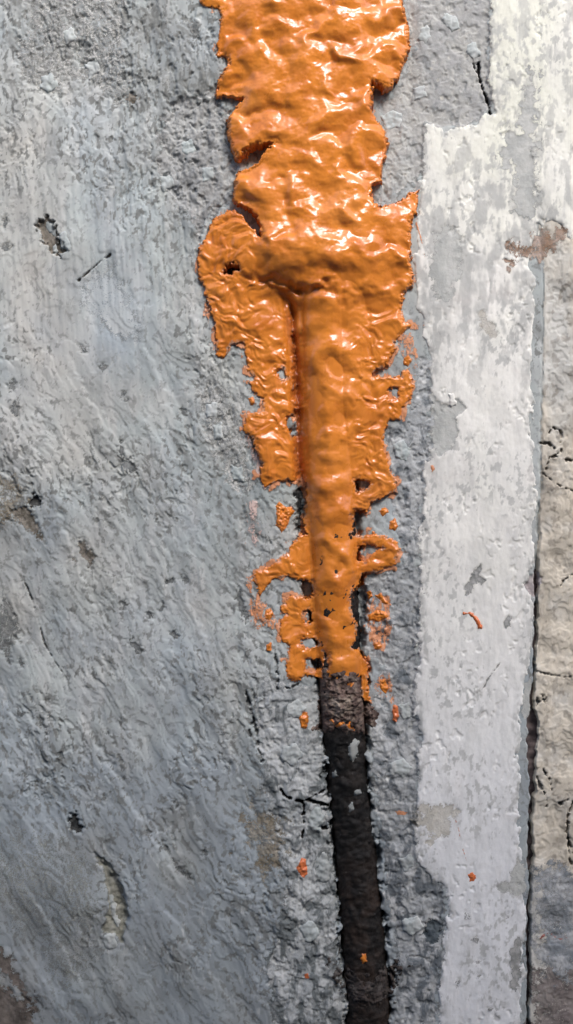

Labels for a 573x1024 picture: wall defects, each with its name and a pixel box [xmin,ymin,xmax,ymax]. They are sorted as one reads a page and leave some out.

crack [472,61,492,115]
peeling [495,65,544,221]
hole [34,214,72,259]
peeling [427,224,463,302]
crack [539,427,573,491]
spalling [465,565,486,596]
crack [245,691,264,762]
rust [311,667,379,734]
hole [67,814,83,833]
crack [279,788,329,838]
crack [526,569,573,1024]
peeling [509,937,522,992]